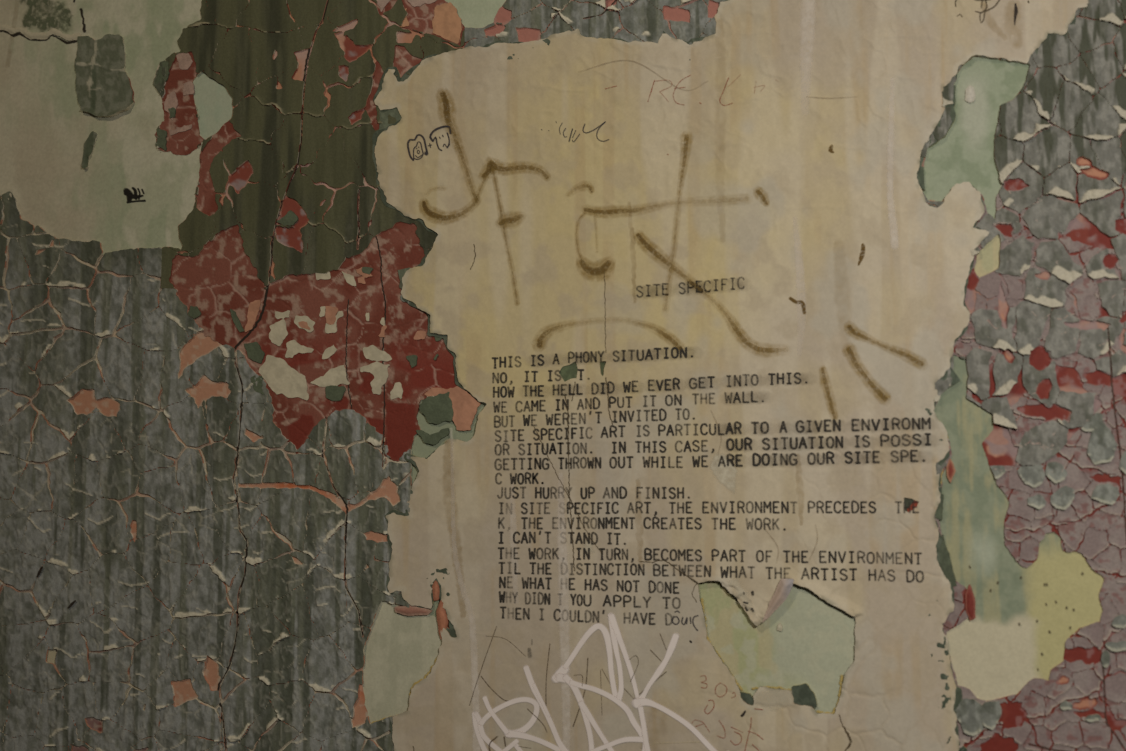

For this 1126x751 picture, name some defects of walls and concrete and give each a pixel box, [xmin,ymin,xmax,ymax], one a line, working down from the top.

crack [217,0,329,750]
crack [322,417,363,637]
crack [344,300,352,409]
peeling [0,0,725,751]
crack [357,189,386,467]
peeling [920,0,1126,751]
crack [1107,328,1126,534]
peeling [698,581,856,714]
crack [1101,654,1125,748]